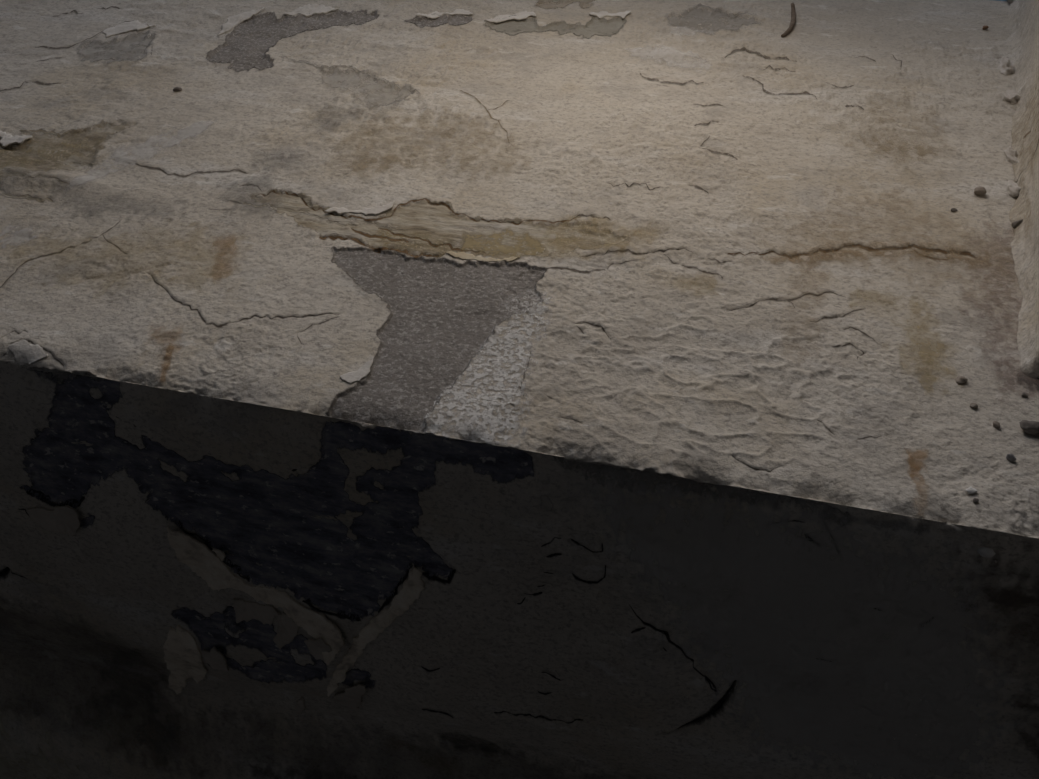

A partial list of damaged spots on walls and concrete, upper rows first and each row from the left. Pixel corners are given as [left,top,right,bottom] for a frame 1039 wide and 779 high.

peeling [78,20,156,63]
peeling [206,4,379,72]
peeling [405,0,631,39]
flaking render [0,121,126,202]
crack [0,221,126,288]
crack [547,244,980,279]
crack [151,275,340,344]
peeling [20,189,628,710]
crack [0,567,25,579]
crack [630,606,737,729]